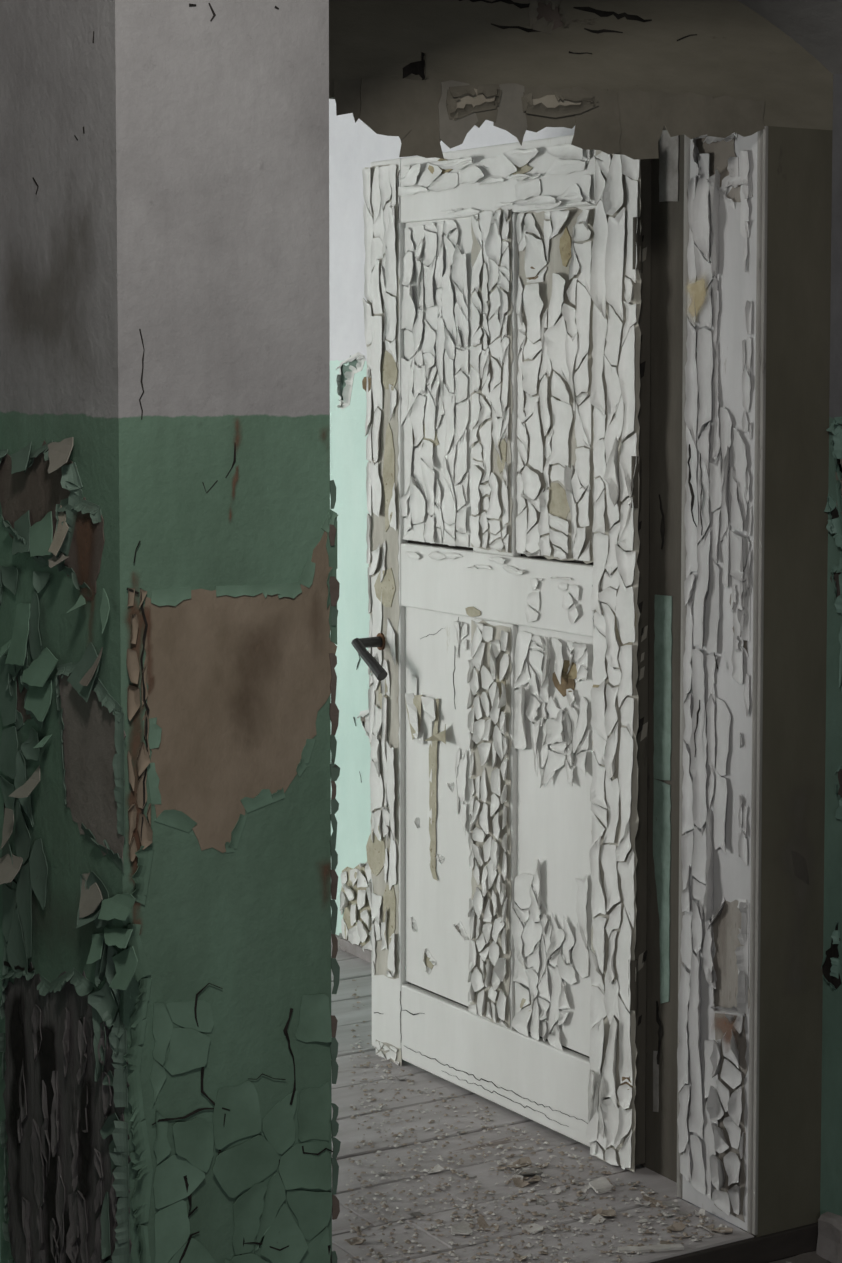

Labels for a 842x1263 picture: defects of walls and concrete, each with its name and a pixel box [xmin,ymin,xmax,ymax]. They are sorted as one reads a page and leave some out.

crack [459,0,541,32]
crack [569,7,652,54]
peeling [0,437,105,614]
peeling [333,52,765,1222]
peeling [0,480,341,1263]
crack [194,983,223,1027]
spalling [821,921,842,992]
crack [252,1008,296,1105]
water stain [9,997,72,1263]
water stain [78,1080,91,1200]
crack [152,1067,230,1155]
crack [179,1175,200,1263]